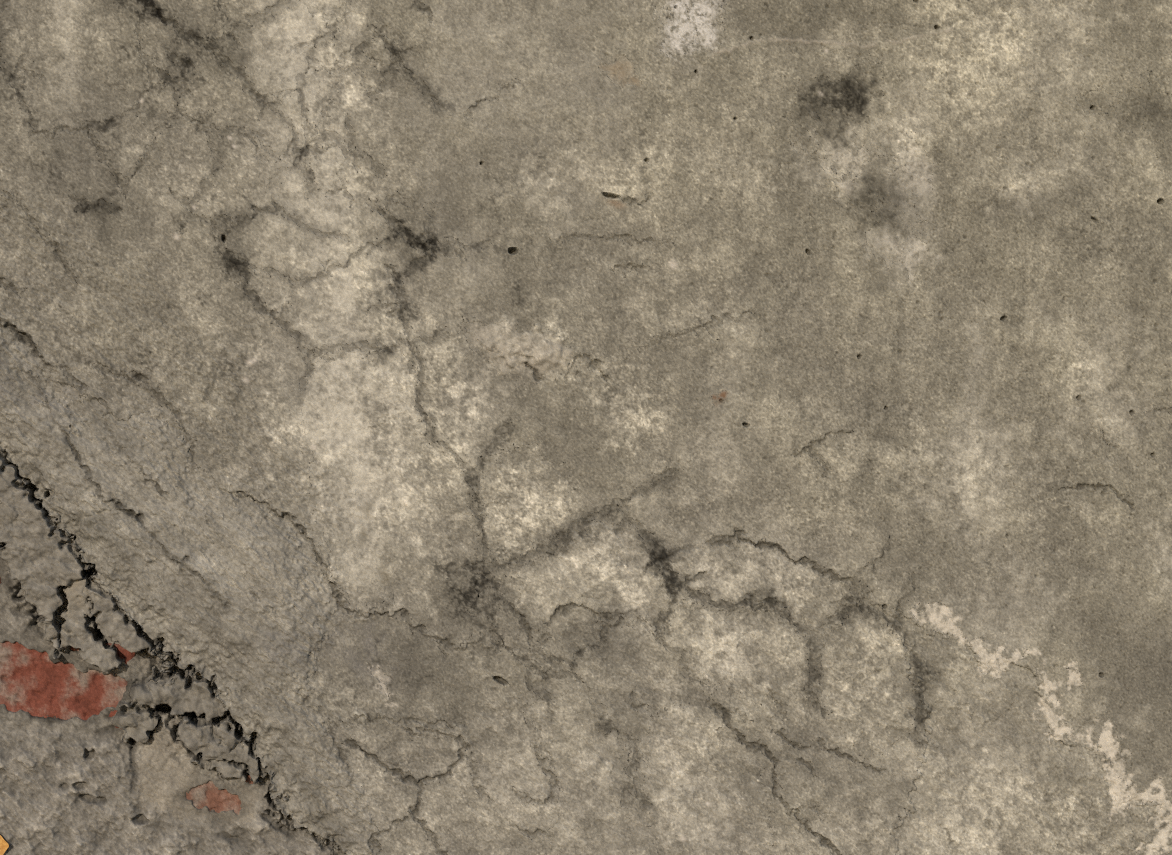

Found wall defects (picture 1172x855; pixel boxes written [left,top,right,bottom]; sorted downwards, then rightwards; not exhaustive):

crack [0,0,521,560]
crack [545,232,673,276]
crack [565,352,609,382]
crack [637,307,754,353]
crack [0,277,276,621]
crack [792,430,853,477]
crack [1050,483,1136,521]
spalling [0,450,333,855]
crack [254,468,949,855]
leakage [910,602,1027,674]
leakage [1038,661,1083,740]
leakage [1098,719,1172,855]